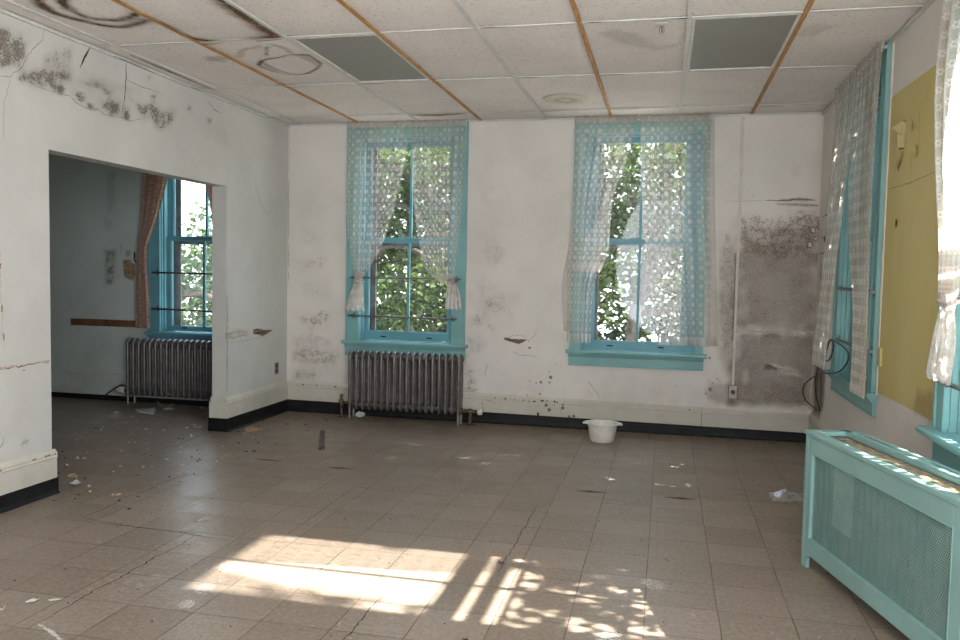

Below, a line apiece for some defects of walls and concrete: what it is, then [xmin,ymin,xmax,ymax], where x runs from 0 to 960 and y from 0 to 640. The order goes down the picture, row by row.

water stain [34,0,146,28]
water stain [219,0,279,39]
water stain [718,208,825,413]
flaking render [252,328,272,337]
crack [26,476,221,630]